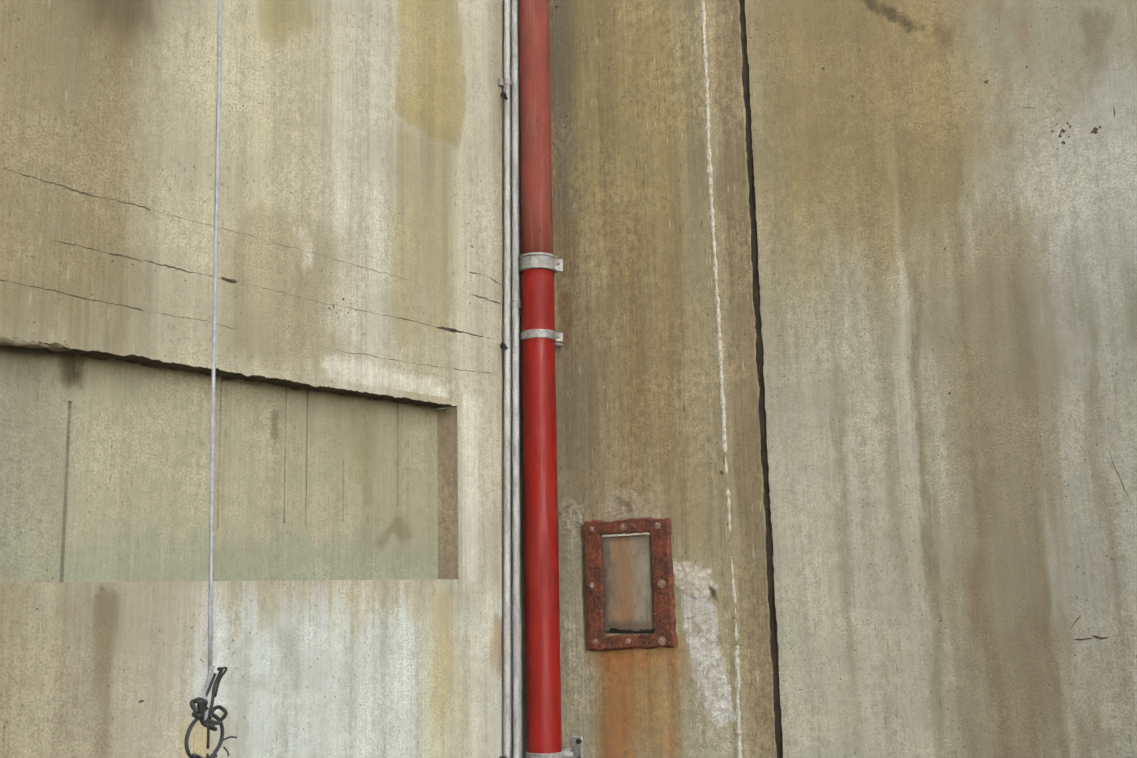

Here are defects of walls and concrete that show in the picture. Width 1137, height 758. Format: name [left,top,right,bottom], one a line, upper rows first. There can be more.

crack [0,279,235,329]
crack [0,168,413,281]
damp [211,0,487,758]
crack [335,349,501,376]
damp [701,0,728,475]
rust [583,623,695,758]
damp [731,556,742,758]